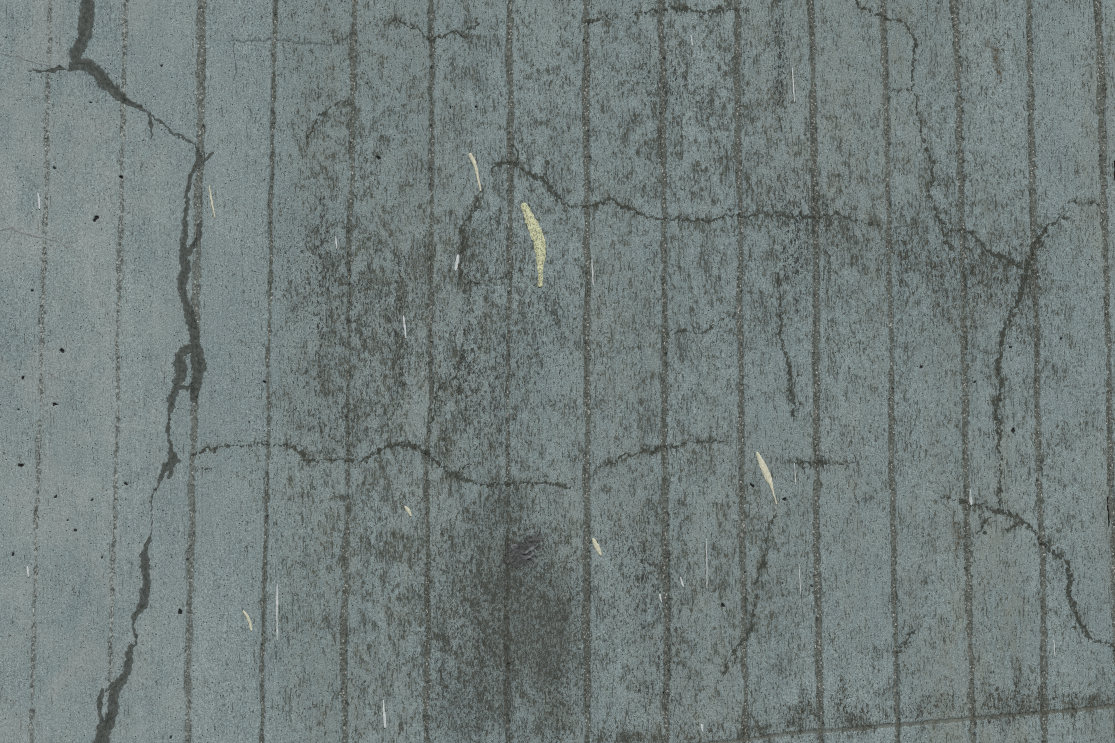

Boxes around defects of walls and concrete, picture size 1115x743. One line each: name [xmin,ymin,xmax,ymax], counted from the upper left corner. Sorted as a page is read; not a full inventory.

crack [584,0,781,24]
crack [457,141,881,296]
crack [29,0,572,743]
crack [666,311,736,335]
crack [776,272,801,422]
crack [856,0,1115,648]
crack [594,434,732,470]
crack [790,459,859,473]
crack [722,514,776,677]
crack [896,630,916,653]